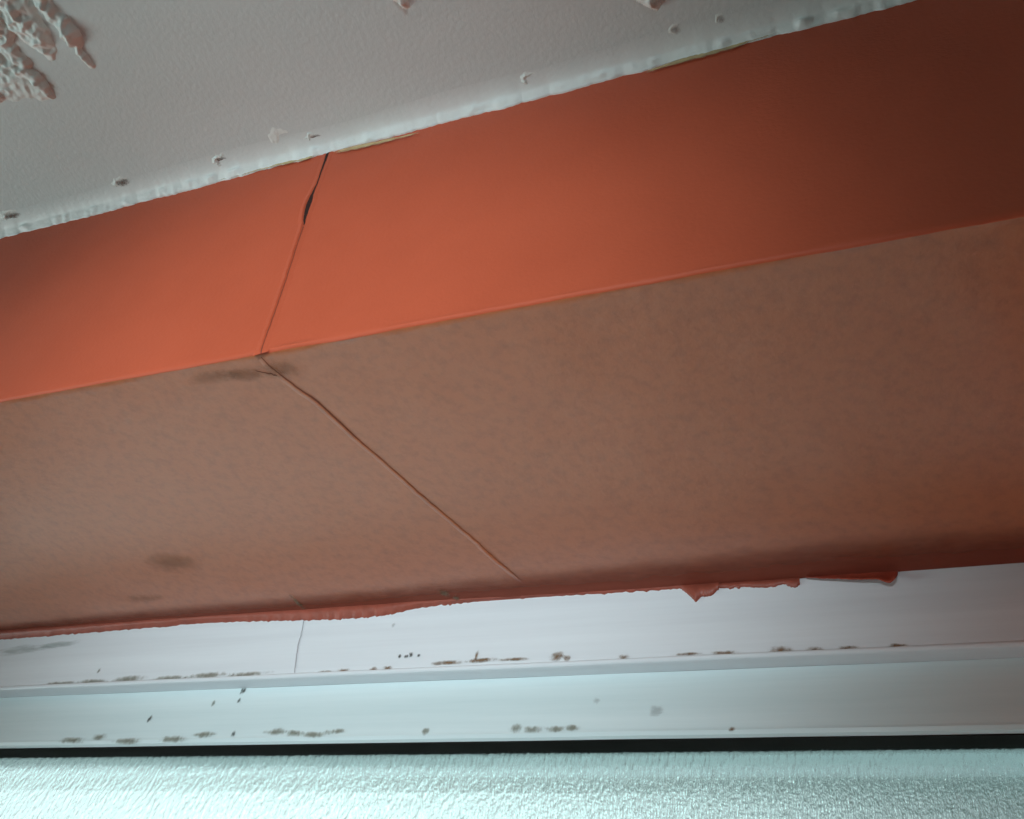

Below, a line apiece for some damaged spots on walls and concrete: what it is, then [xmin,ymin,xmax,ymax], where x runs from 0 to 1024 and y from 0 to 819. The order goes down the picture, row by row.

crack [253,151,523,582]
peeling [806,571,898,583]